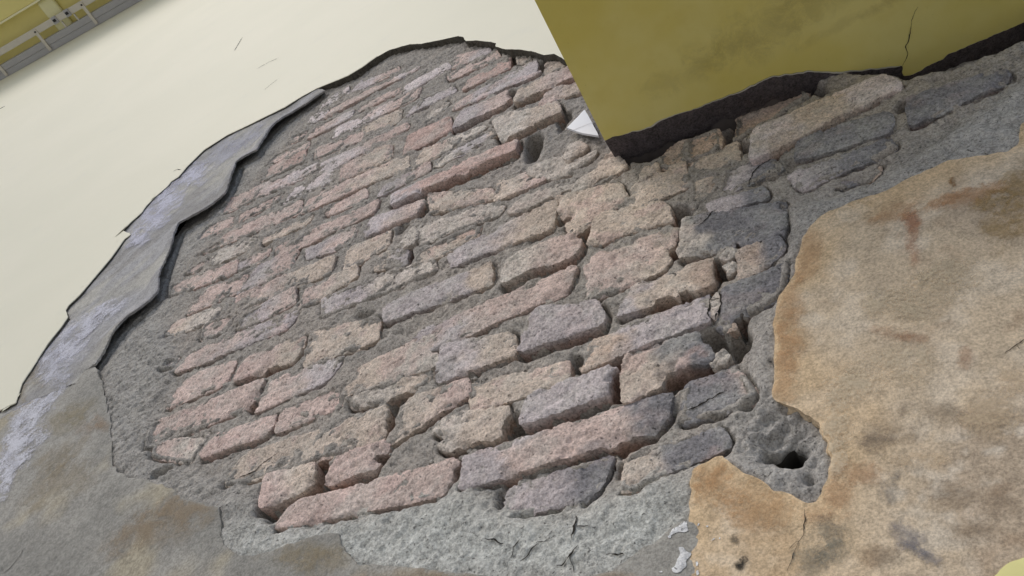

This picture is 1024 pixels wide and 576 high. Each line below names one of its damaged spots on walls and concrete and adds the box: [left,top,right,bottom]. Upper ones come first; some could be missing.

spalling [848,22,1024,80]
spalling [605,72,839,159]
peeling [0,55,378,411]
spalling [511,272,551,291]
spalling [667,260,686,275]
spalling [435,313,531,384]
efflorescence [0,298,131,501]
spalling [366,398,409,444]
spalling [378,420,450,478]
spalling [432,399,529,459]
spalling [391,337,623,448]
spalling [518,464,569,486]